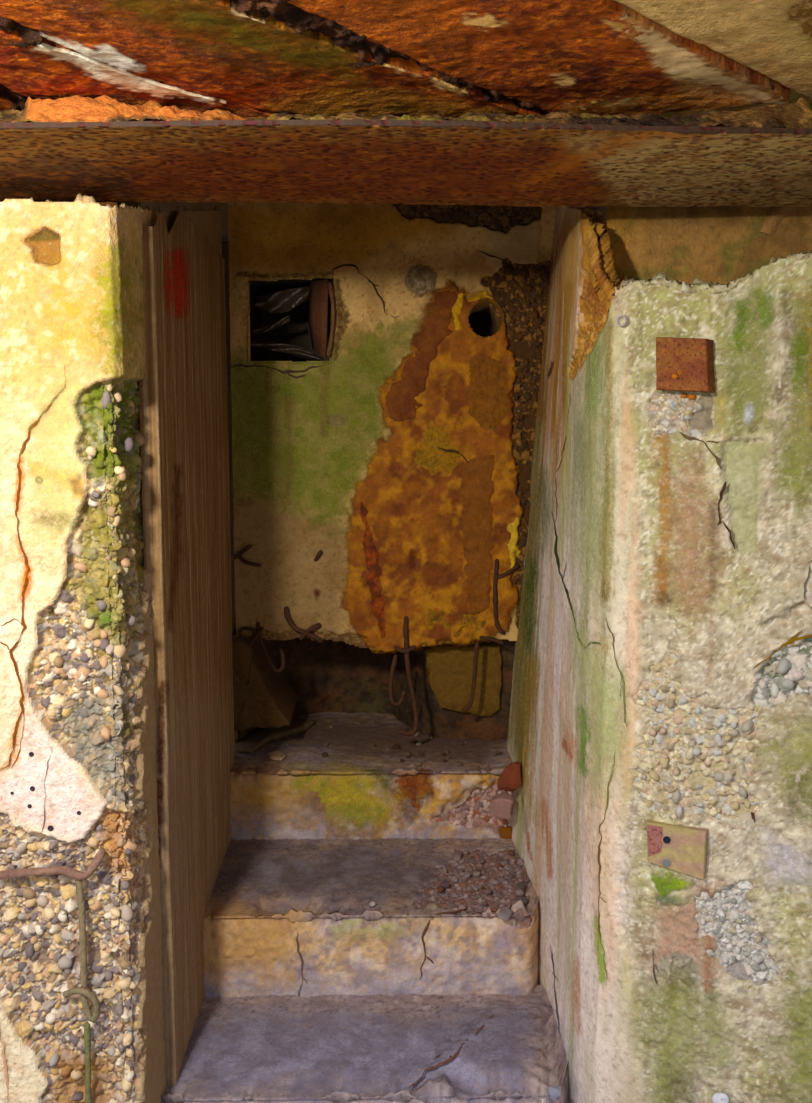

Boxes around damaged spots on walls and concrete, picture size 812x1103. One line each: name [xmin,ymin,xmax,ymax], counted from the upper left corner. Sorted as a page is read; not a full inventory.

peeling [463,13,508,28]
peeling [604,10,788,104]
spalling [786,0,812,37]
crack [0,366,66,769]
corrosion [342,281,524,654]
crack [552,393,627,726]
damp [602,467,613,599]
crack [679,432,736,550]
spalling [0,377,148,1103]
spalling [631,634,812,825]
crack [420,908,467,979]
crack [598,750,616,979]